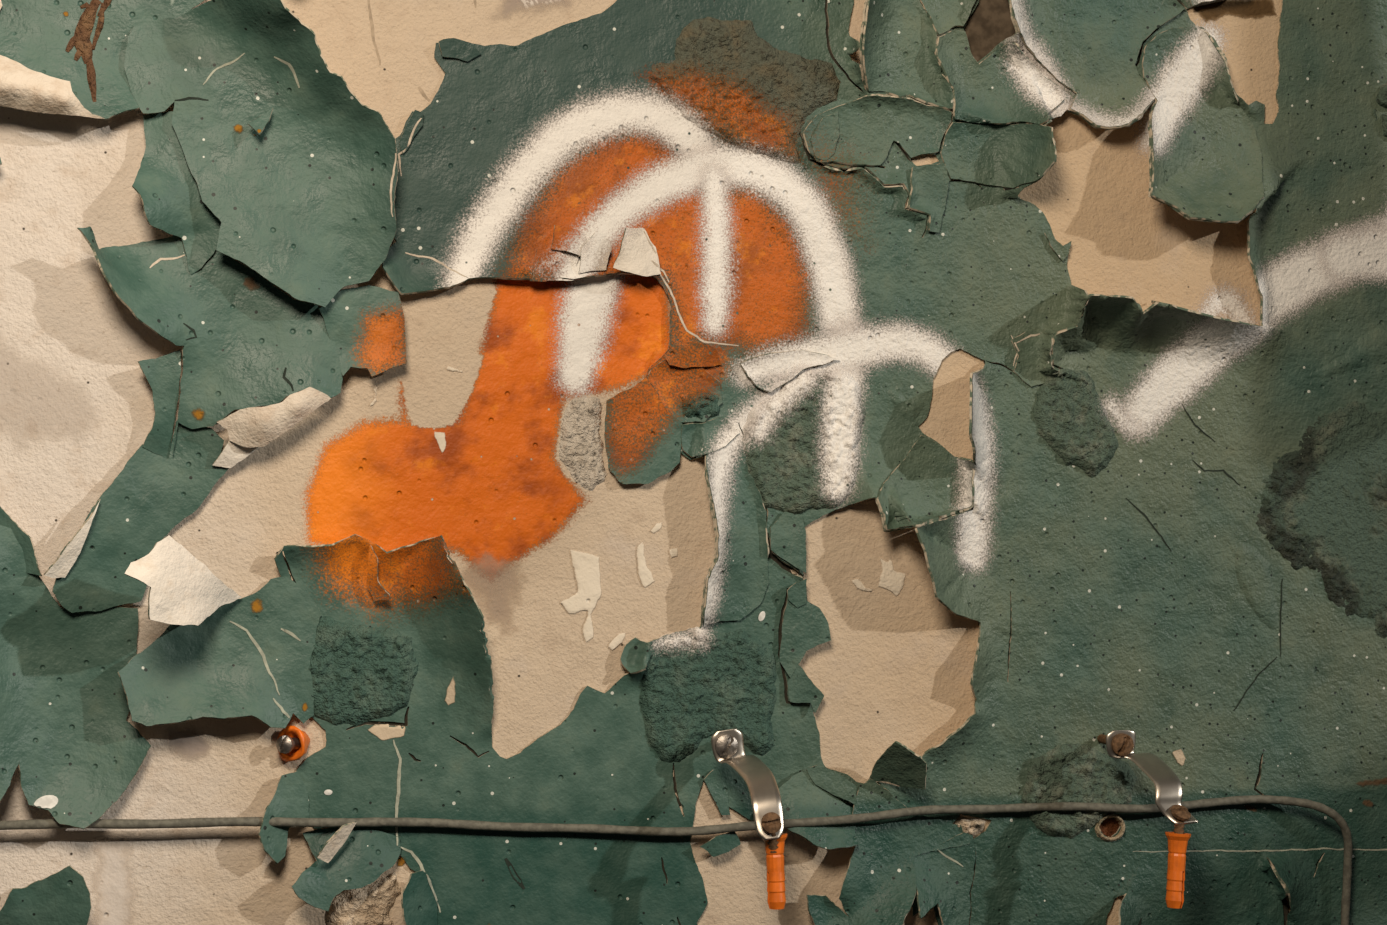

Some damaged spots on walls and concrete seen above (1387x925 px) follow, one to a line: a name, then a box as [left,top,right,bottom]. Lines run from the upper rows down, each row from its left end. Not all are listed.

peeling [0,0,616,925]
peeling [530,225,661,282]
peeling [449,294,991,925]
peeling [648,0,1282,326]